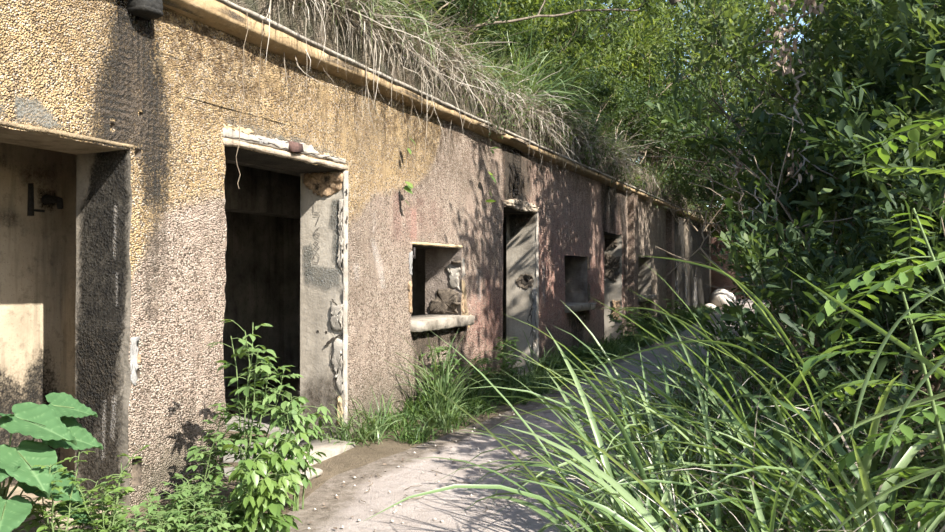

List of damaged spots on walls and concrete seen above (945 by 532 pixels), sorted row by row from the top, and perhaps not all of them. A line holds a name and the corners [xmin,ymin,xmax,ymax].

spalling [222,123,344,160]
water stain [0,349,60,462]
water stain [74,0,169,502]
spalling [303,171,344,274]
peeling [317,304,344,427]
spalling [429,258,469,315]
peeling [516,274,537,356]